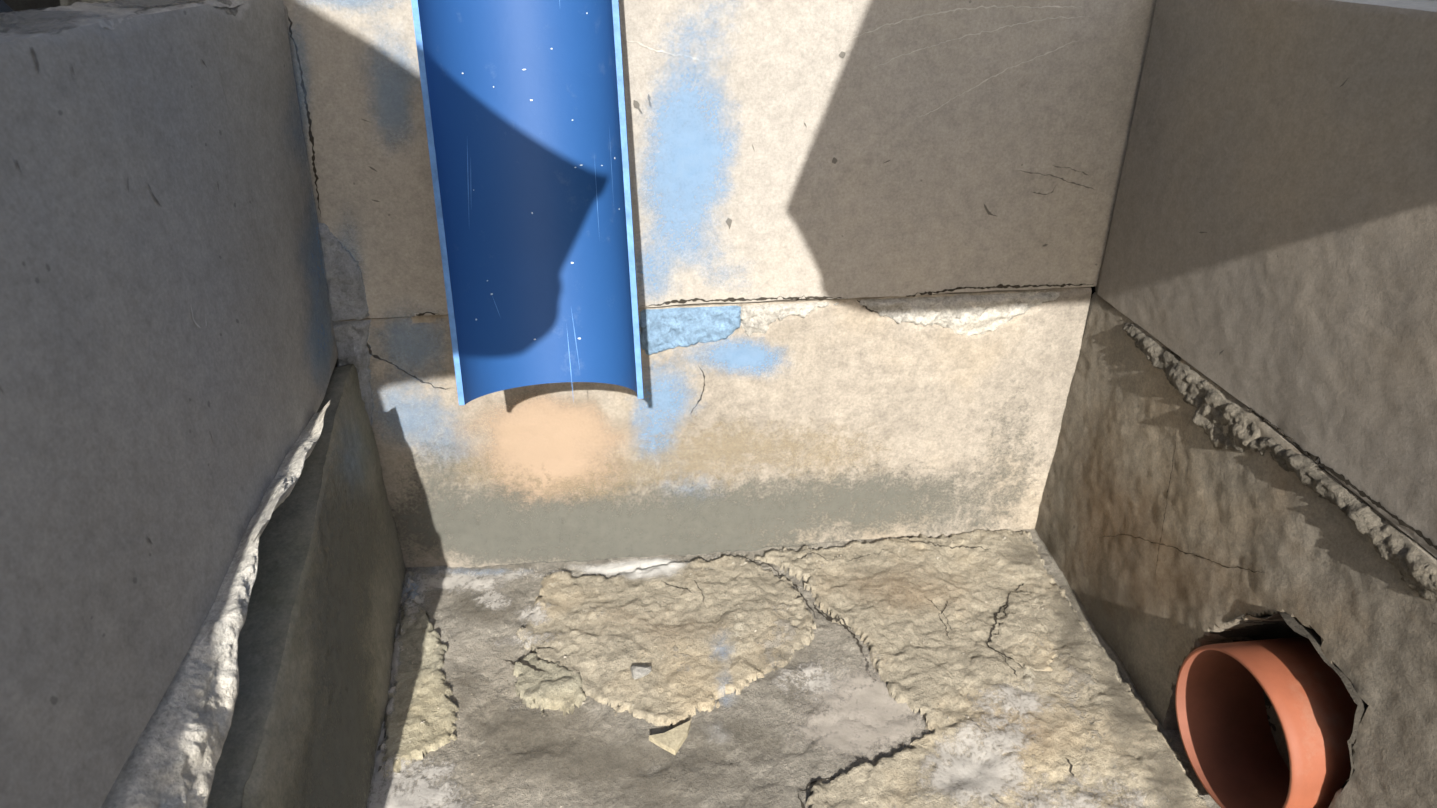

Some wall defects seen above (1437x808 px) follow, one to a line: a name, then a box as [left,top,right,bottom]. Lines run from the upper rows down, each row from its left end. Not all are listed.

crack [286,8,321,214]
spalling [317,223,374,426]
spalling [639,302,839,355]
spalling [860,290,1060,337]
crack [1103,424,1265,573]
crack [1248,408,1437,550]
crack [742,538,988,682]
crack [987,584,1023,675]
crack [798,774,840,808]